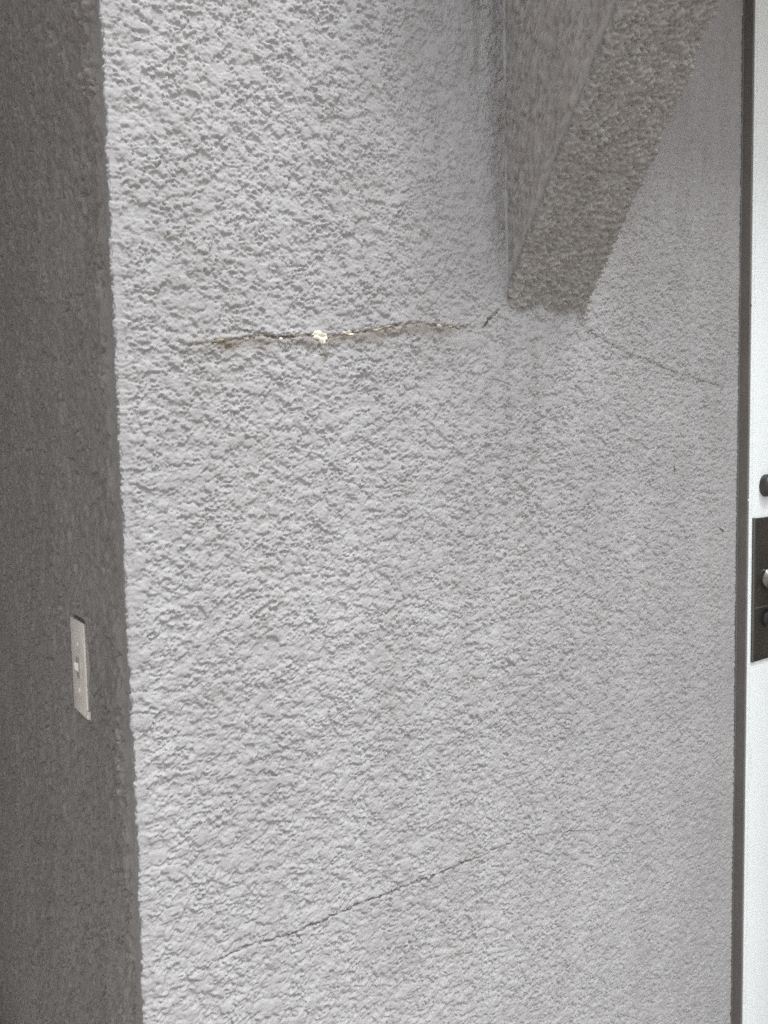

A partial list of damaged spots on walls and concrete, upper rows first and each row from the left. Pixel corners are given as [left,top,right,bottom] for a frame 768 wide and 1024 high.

crack [176,310,498,348]
crack [199,830,587,970]